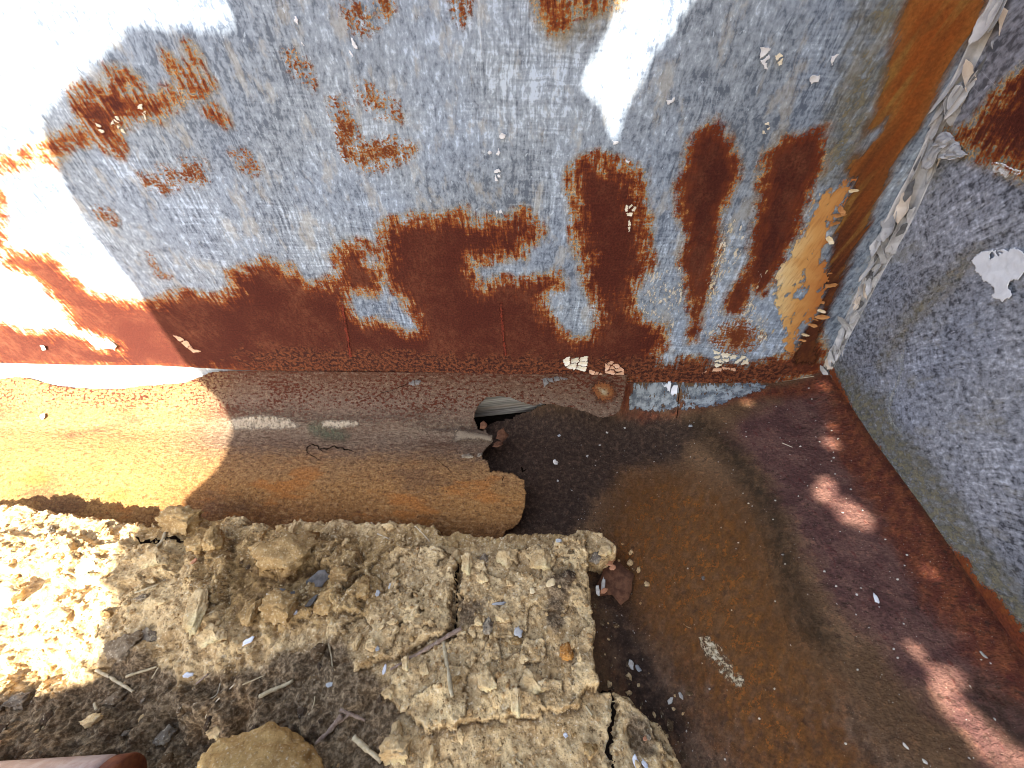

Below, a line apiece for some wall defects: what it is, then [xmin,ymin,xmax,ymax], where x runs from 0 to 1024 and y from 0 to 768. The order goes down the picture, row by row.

corrosion [0,0,988,417]
peeling [743,0,1008,375]
corrosion [941,65,1024,185]
peeling [992,162,1021,178]
peeling [971,247,1024,302]
peeling [542,356,624,387]
corrosion [597,478,854,768]
corrosion [950,547,1024,655]
crack [600,690,616,768]